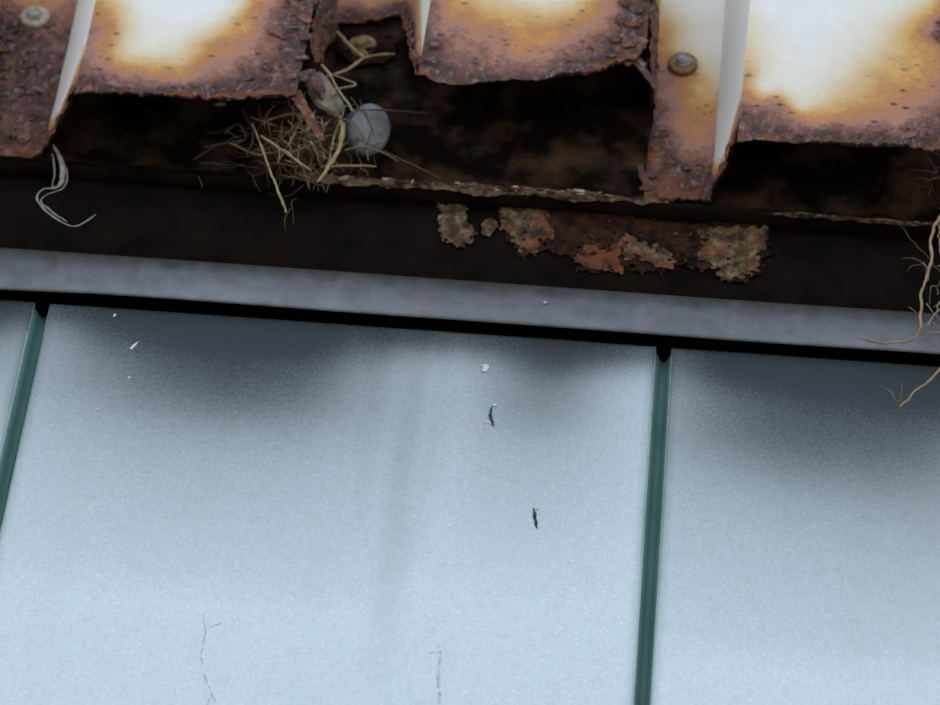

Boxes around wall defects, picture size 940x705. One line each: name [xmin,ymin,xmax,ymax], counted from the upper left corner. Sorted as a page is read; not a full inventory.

rust [0,0,940,205]
peeling [437,203,772,283]
rust [767,212,940,226]